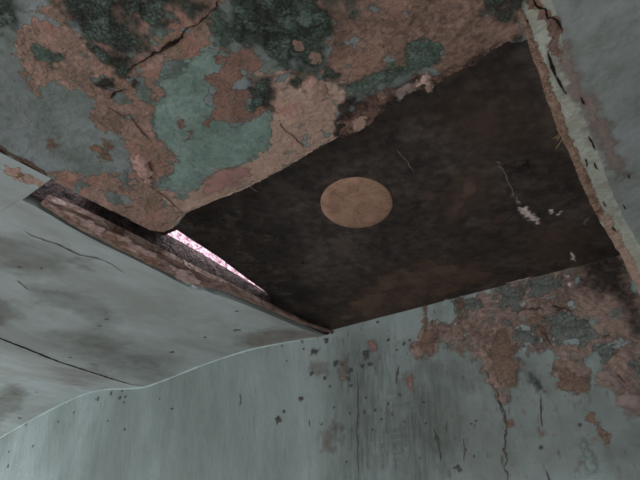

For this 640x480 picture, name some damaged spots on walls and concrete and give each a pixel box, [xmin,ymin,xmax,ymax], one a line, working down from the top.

crack [126,0,221,73]
crack [547,52,585,105]
peeling [4,0,523,232]
crack [585,137,598,169]
peeling [409,0,640,416]
crack [25,231,121,271]
crack [486,371,508,477]